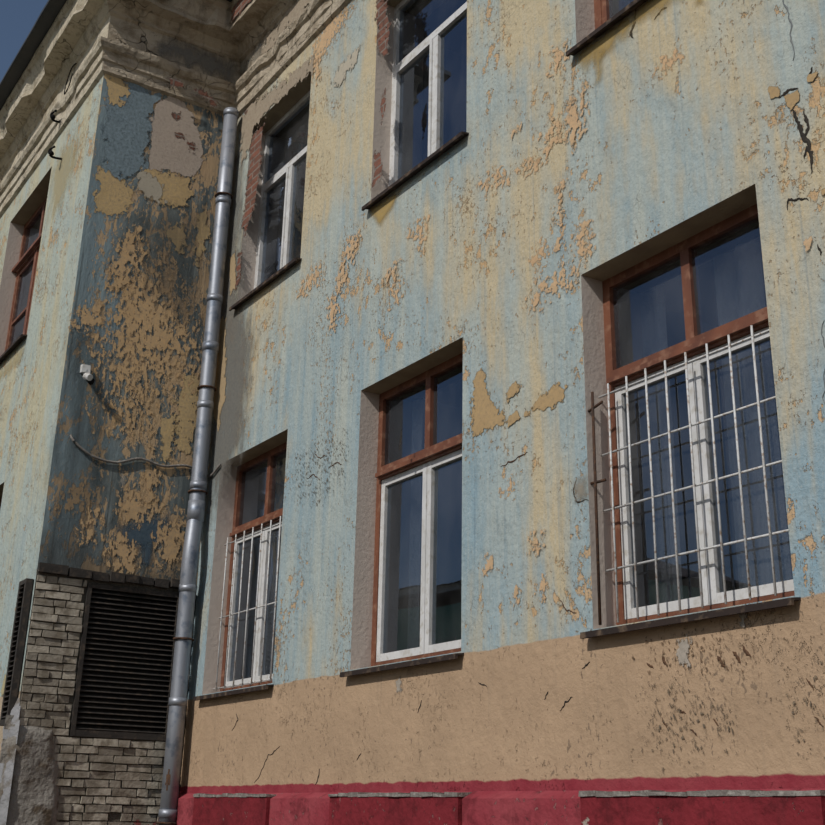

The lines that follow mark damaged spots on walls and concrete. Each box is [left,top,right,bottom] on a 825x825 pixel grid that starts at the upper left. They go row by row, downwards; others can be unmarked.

spalling [374,0,391,56]
peeling [104,74,132,107]
spalling [92,96,203,218]
spalling [238,0,362,236]
spalling [372,147,383,188]
peeling [476,77,590,201]
crack [768,0,825,210]
peeling [325,224,362,335]
peeling [522,178,596,313]
crack [803,236,822,255]
peeling [48,210,211,574]
peeling [469,368,568,437]